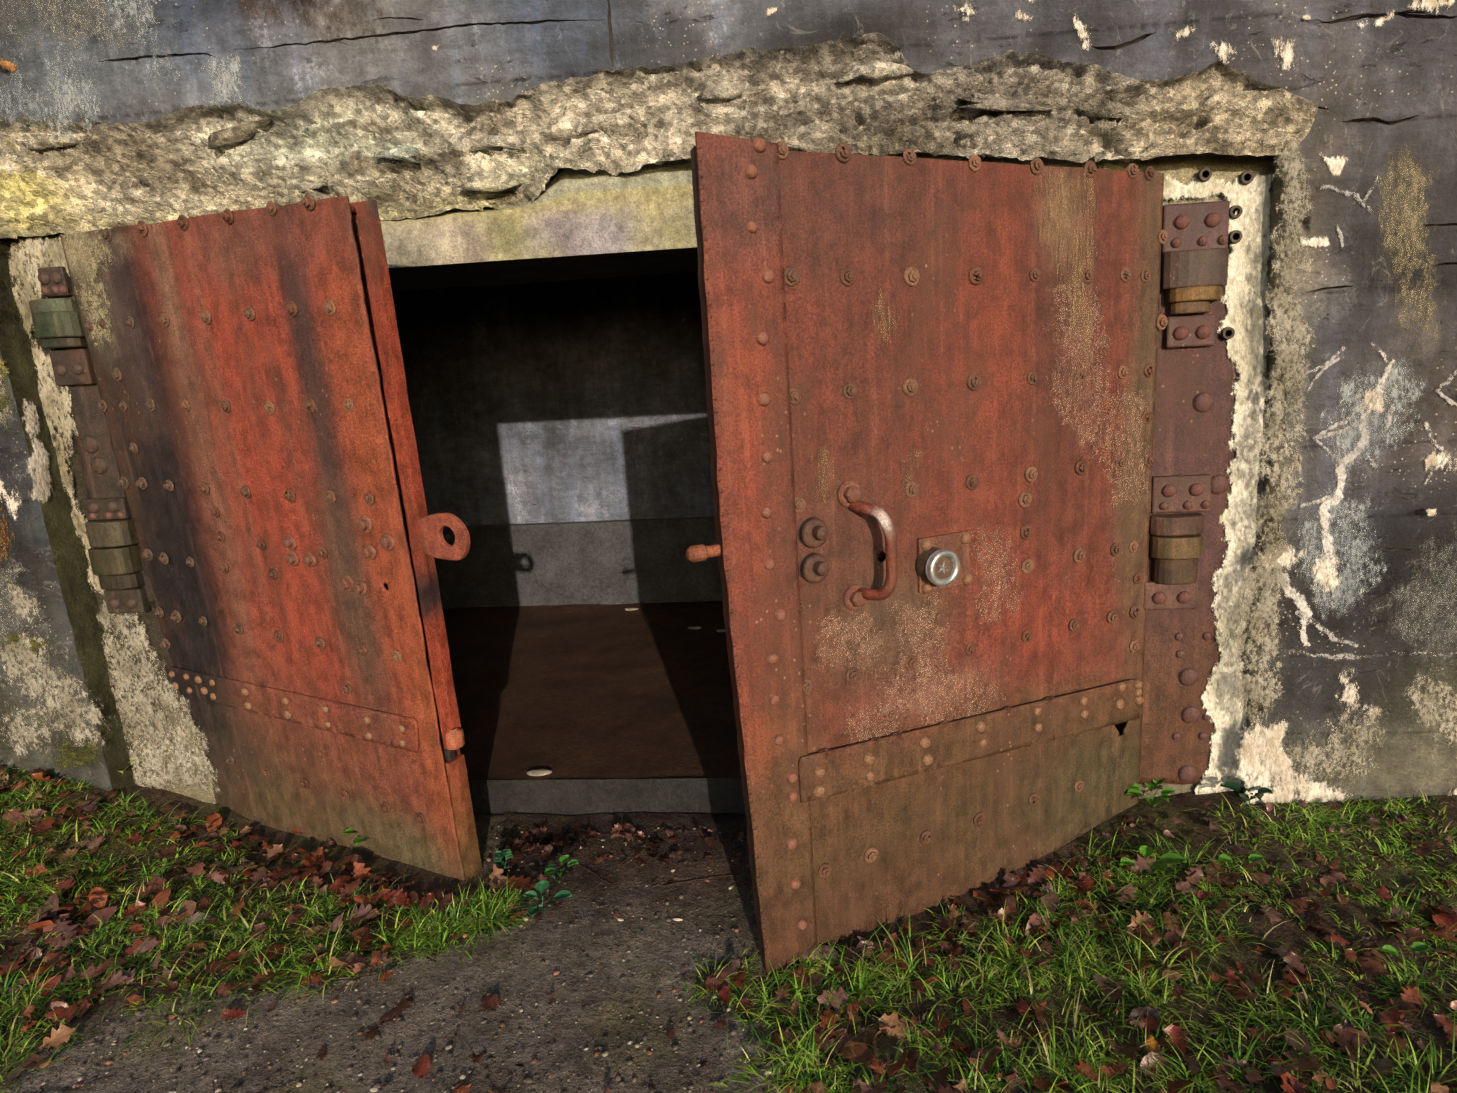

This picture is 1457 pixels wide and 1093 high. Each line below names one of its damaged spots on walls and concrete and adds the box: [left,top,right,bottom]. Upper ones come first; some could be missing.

rust [0,58,17,73]
crack [99,0,613,66]
crack [1317,10,1457,24]
spalling [0,32,1319,795]
water stain [1337,366,1418,464]